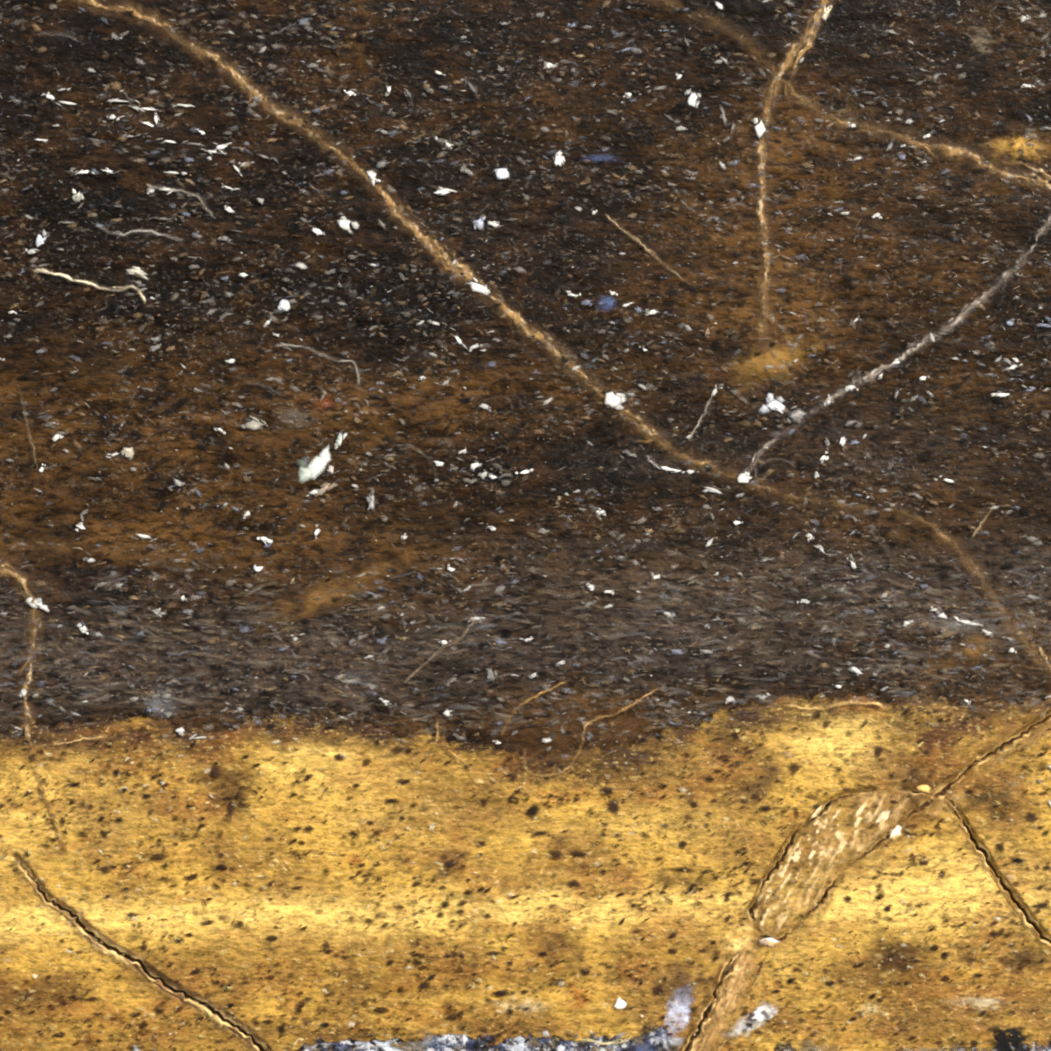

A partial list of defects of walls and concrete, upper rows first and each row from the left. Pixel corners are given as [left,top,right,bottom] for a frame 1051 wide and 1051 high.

crack [76,0,711,467]
crack [755,0,829,332]
crack [814,116,1051,412]
crack [743,434,780,489]
crack [0,563,41,741]
crack [789,702,883,710]
crack [998,604,1051,673]
crack [33,772,62,842]
crack [19,862,265,1051]
crack [682,713,1051,1051]